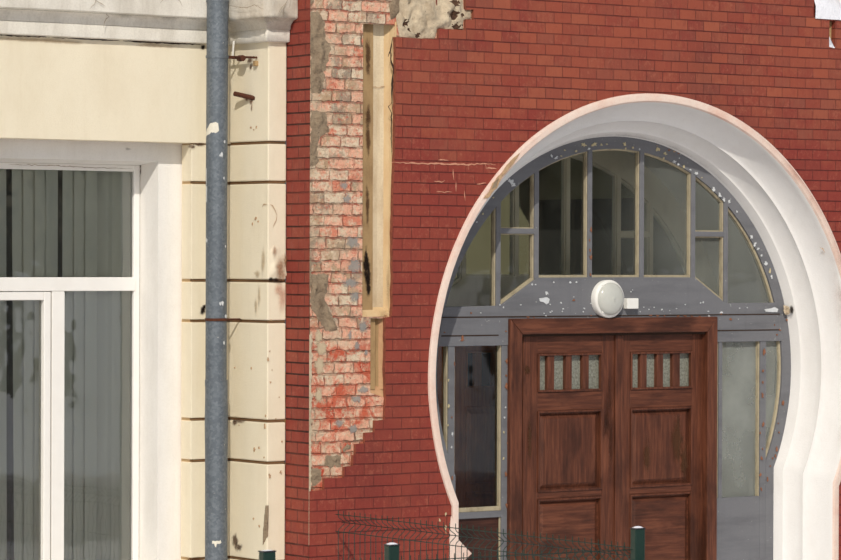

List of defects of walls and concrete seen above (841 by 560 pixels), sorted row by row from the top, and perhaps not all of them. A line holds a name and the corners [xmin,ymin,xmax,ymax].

crack [0,1,200,45]
crack [374,37,497,197]
spalling [309,0,471,491]